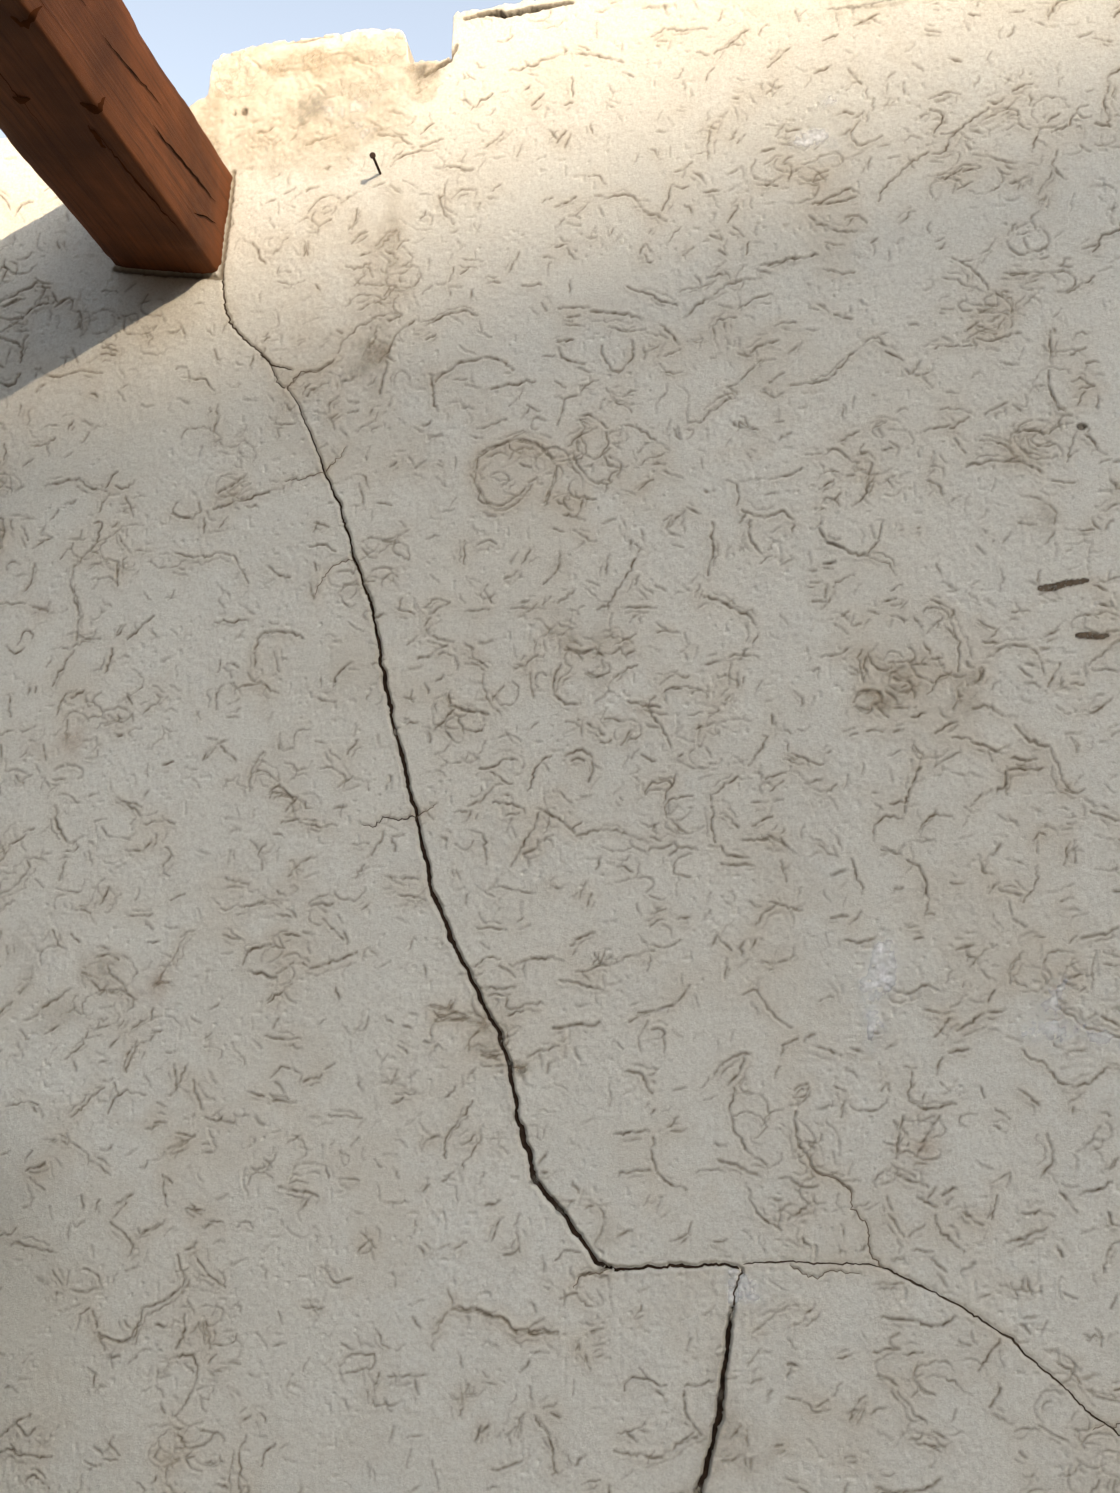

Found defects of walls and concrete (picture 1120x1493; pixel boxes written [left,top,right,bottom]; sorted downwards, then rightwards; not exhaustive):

crack [222,277,1120,1493]